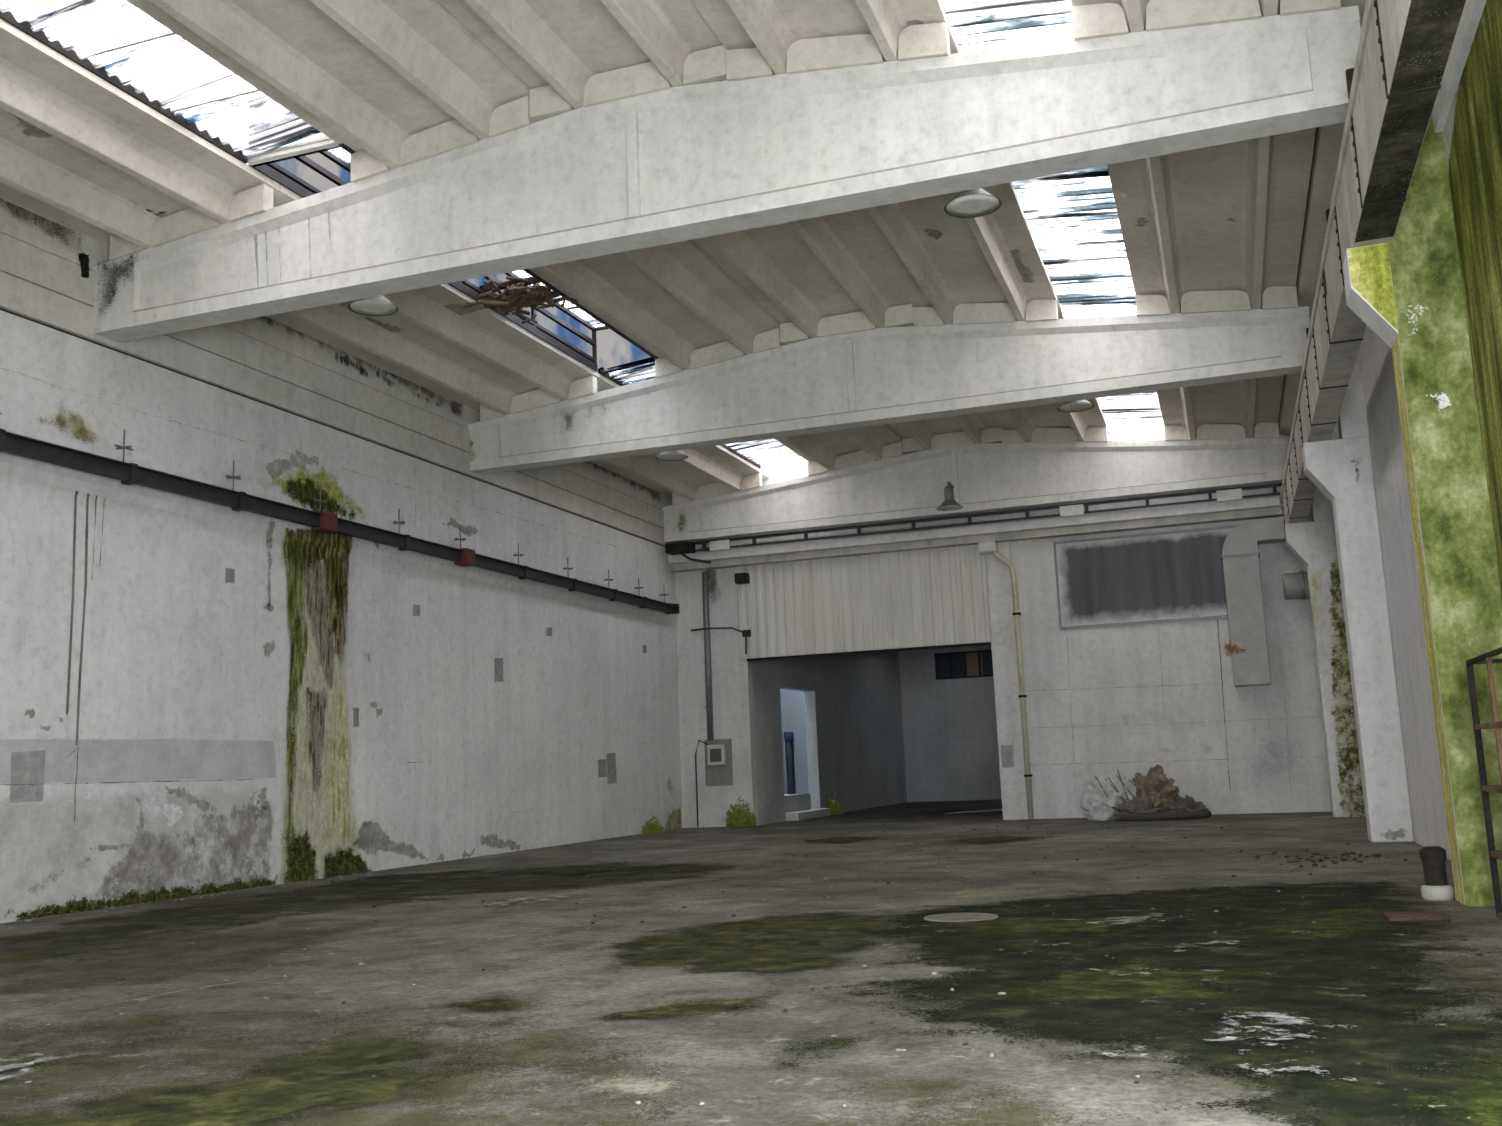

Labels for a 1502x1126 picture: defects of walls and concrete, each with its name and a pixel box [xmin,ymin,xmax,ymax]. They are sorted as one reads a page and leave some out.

damp [34,406,114,445]
damp [0,491,734,1000]
peeling [22,786,277,909]
flaking render [353,821,521,862]